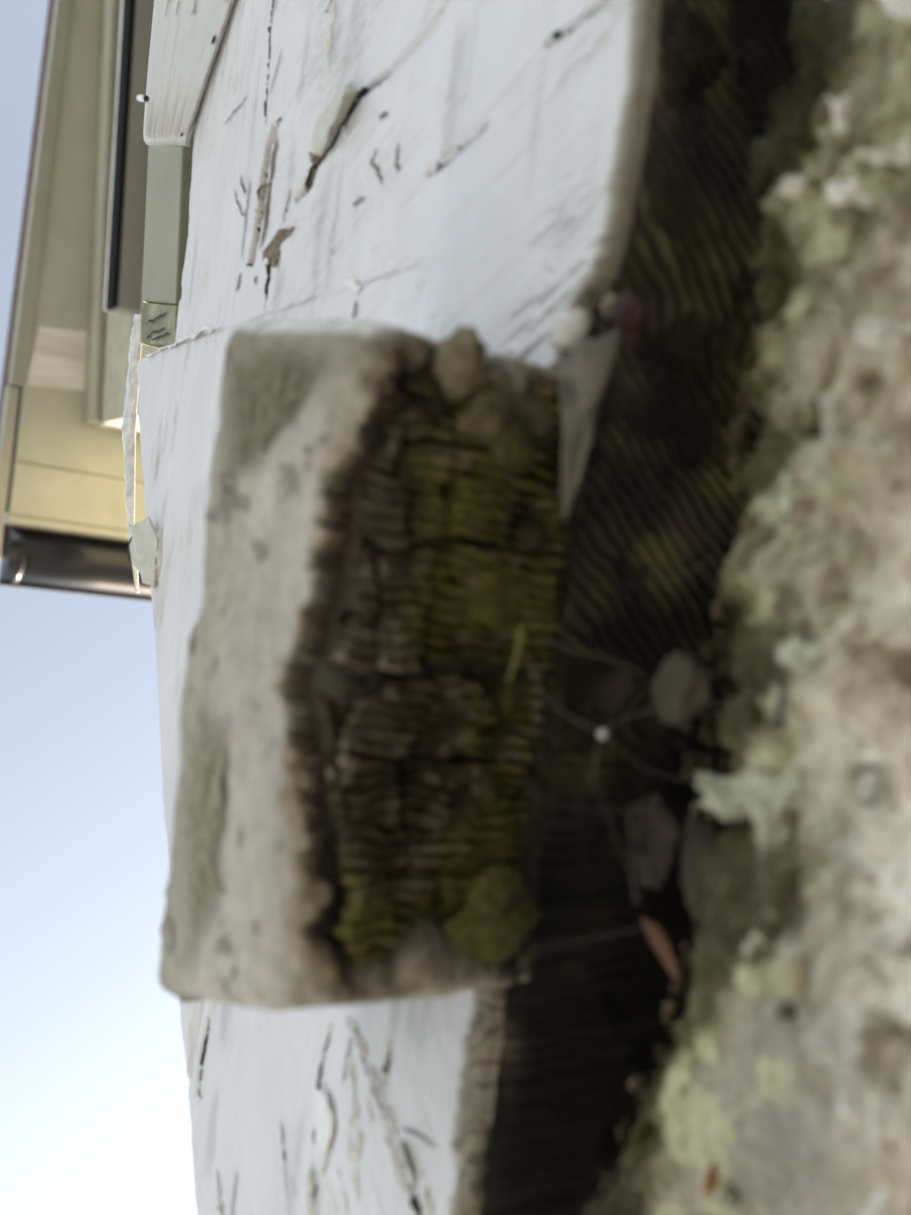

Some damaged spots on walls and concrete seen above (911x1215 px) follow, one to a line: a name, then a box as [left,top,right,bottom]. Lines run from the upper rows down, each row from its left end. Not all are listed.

peeling [235,82,381,300]
water stain [229,353,314,469]
water stain [184,719,223,934]
peeling [336,1052,433,1215]